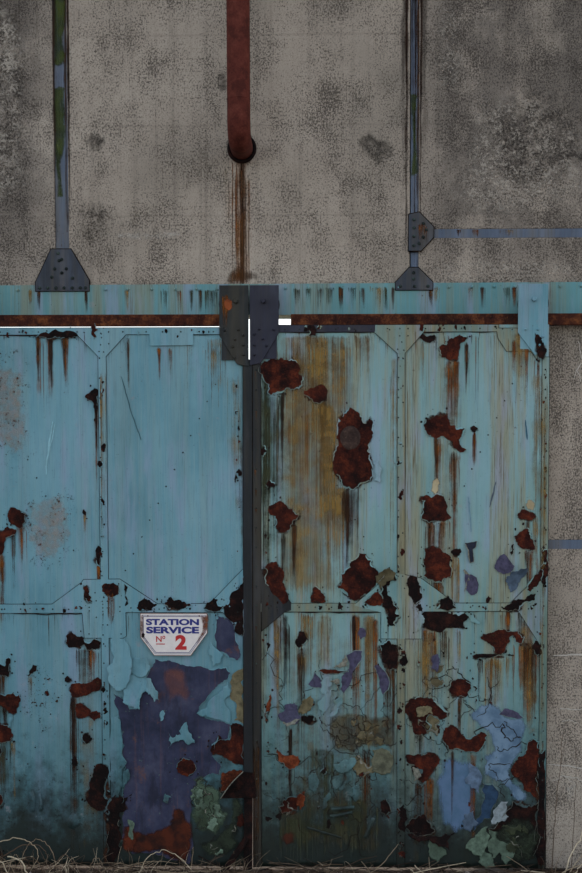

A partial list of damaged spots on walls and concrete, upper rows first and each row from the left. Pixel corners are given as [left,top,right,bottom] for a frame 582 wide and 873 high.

rust [228,163,252,284]
rust [29,327,85,389]
rust [180,290,232,320]
rust [255,331,549,866]
rust [62,630,132,865]
peeling [101,616,243,864]
peeling [278,650,364,727]
peeling [500,708,542,719]
peeling [428,840,447,862]
peeling [461,758,515,869]